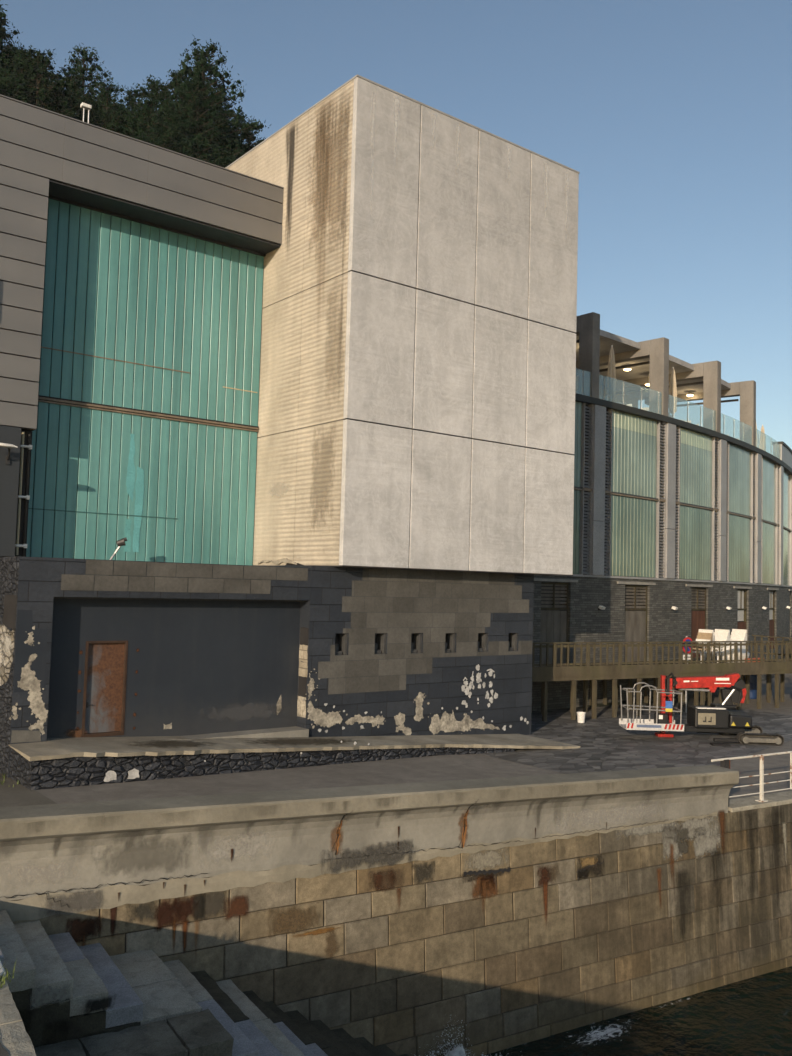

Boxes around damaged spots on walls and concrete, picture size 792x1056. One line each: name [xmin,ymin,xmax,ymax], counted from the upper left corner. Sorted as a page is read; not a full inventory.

water stain [287,127,295,234]
peeling [9,610,48,743]
peeling [297,602,529,745]
peeling [104,768,139,782]
water stain [47,891,102,915]
rust [66,892,120,946]
water stain [131,901,157,921]
rust [155,880,248,951]
water stain [322,841,435,883]
rust [370,869,402,902]
rust [538,867,556,919]
water stain [775,813,786,861]